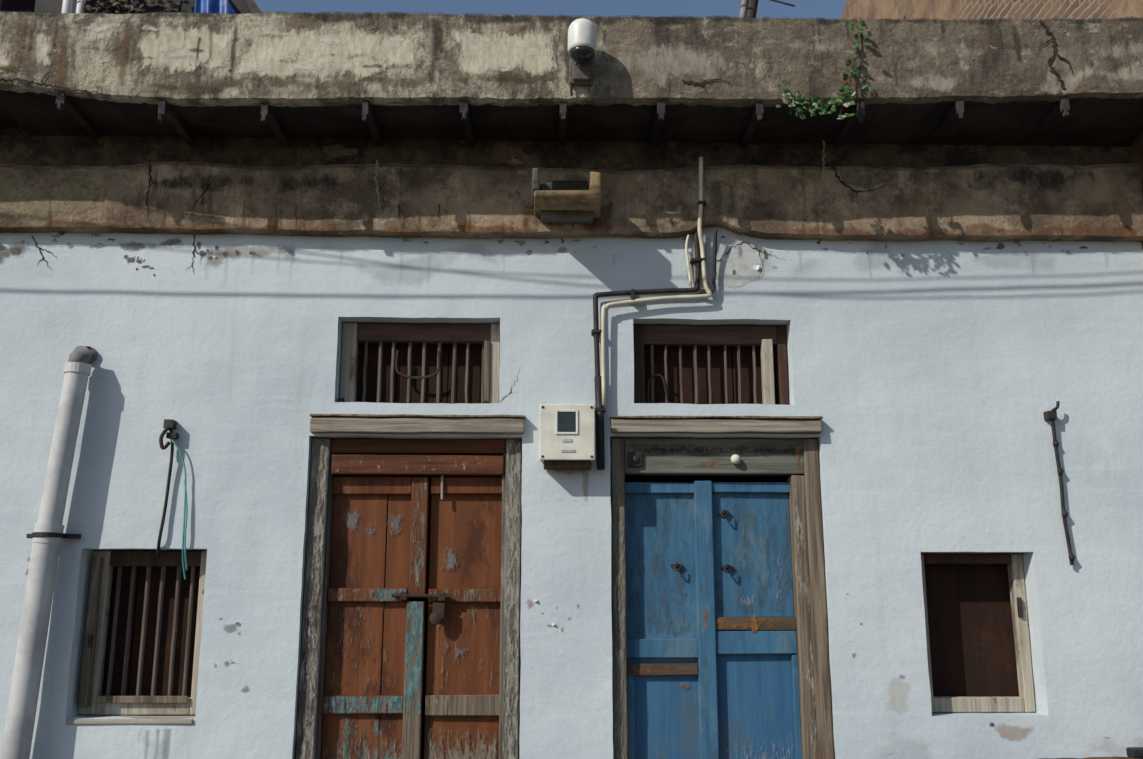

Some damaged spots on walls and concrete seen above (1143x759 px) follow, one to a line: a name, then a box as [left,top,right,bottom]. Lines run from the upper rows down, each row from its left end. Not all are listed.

water stain [304,11,402,23]
crack [1037,20,1074,90]
crack [146,163,157,214]
crack [819,141,888,207]
crack [31,236,57,270]
crack [186,179,218,273]
peeling [197,242,256,260]
flaking render [683,227,774,288]